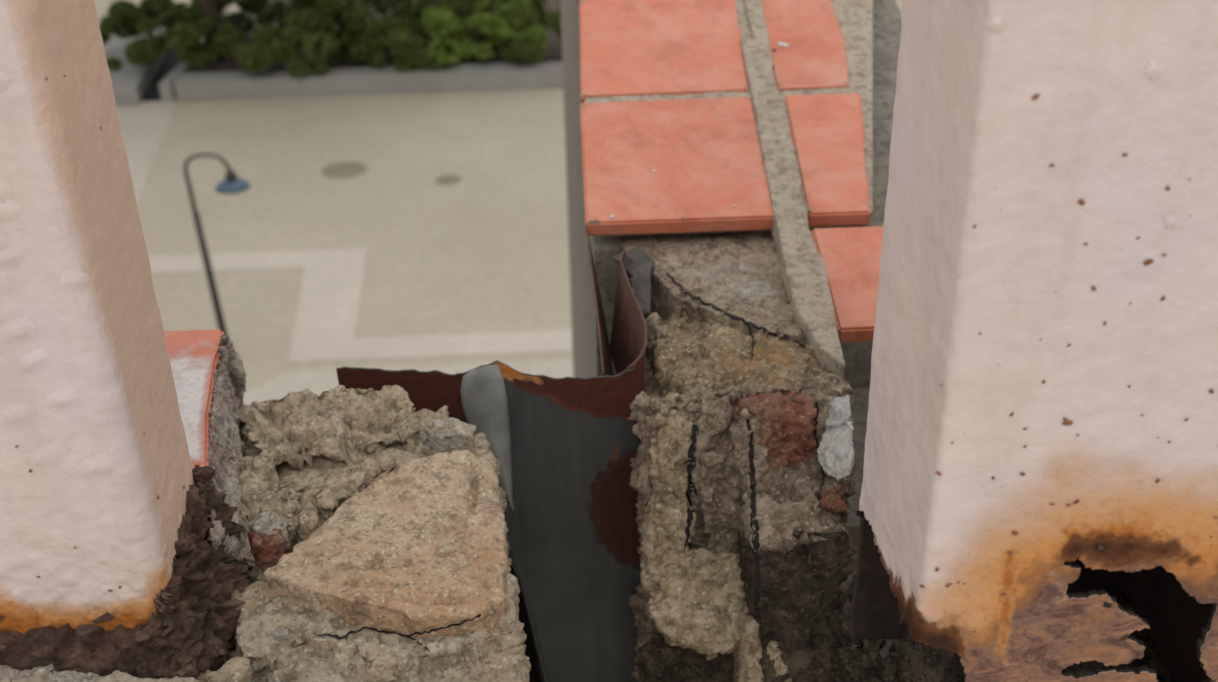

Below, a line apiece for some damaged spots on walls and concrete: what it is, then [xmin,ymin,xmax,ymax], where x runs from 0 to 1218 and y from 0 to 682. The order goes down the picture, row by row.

rust [0,0,194,634]
rust [492,356,644,424]
rust [590,449,641,570]
peeling [75,612,114,637]
rust [874,473,1218,682]
spalling [1061,628,1174,682]
spalling [1114,595,1137,614]